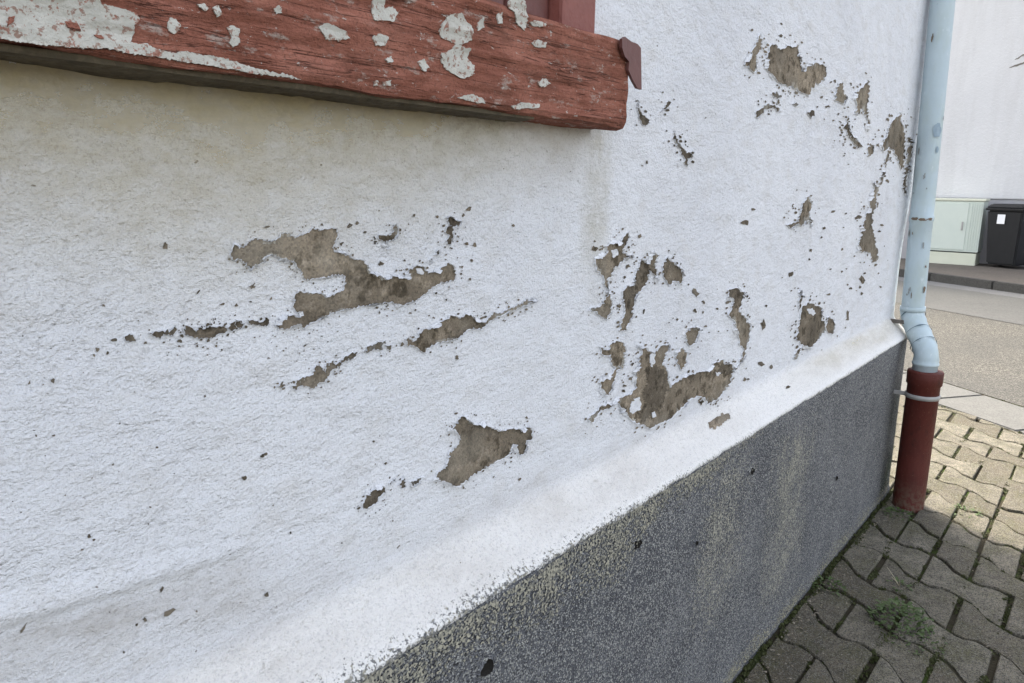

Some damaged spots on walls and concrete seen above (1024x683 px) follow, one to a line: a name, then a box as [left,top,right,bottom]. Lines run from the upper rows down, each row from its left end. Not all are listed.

peeling [743,23,917,197]
peeling [93,207,538,394]
peeling [583,228,773,437]
peeling [782,270,849,360]
peeling [783,190,862,240]
peeling [354,412,538,517]